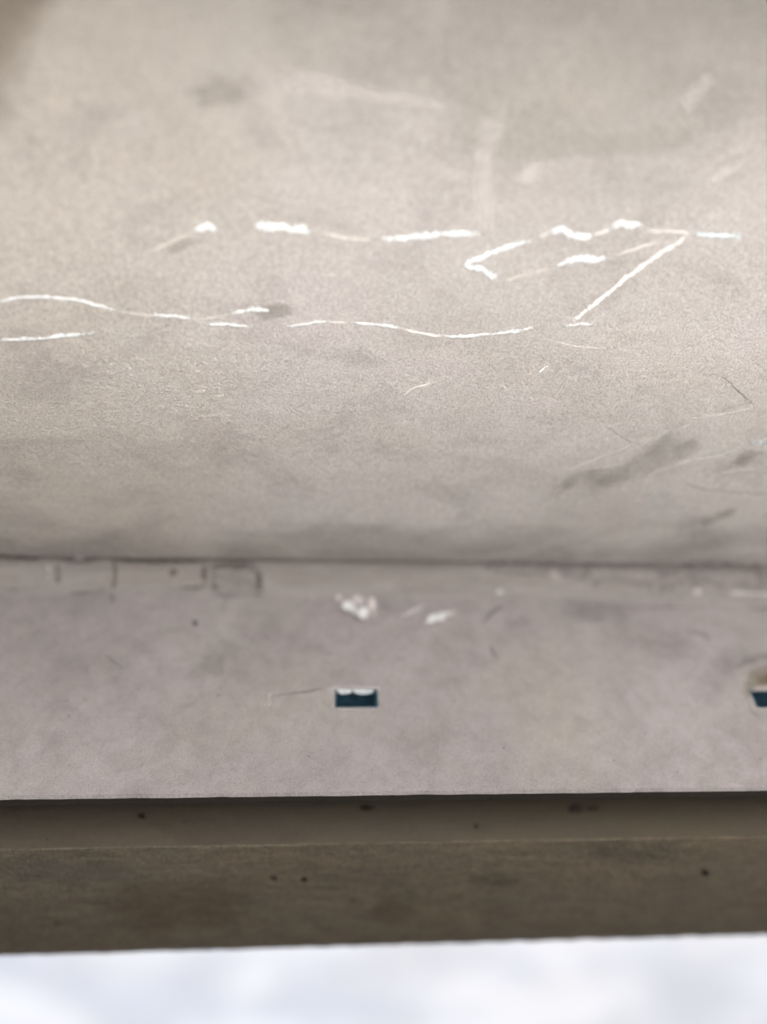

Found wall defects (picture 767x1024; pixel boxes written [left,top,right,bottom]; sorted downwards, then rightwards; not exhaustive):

crack [143,222,217,254]
crack [253,219,743,327]
crack [0,294,270,342]
crack [289,321,532,339]